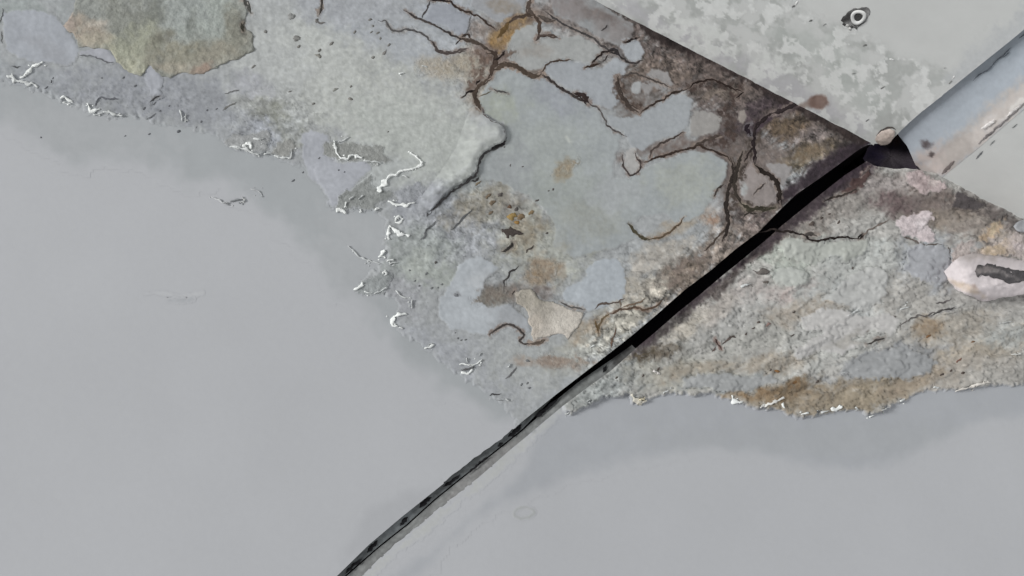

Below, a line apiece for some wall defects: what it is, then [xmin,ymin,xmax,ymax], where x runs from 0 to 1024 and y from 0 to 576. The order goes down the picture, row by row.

corrosion [414,9,529,84]
flaking render [0,0,1024,426]
crack [498,238,534,296]
crack [486,322,550,401]
crack [556,295,668,348]
crack [710,334,735,353]
crack [863,299,959,349]
leakage [378,386,1024,576]